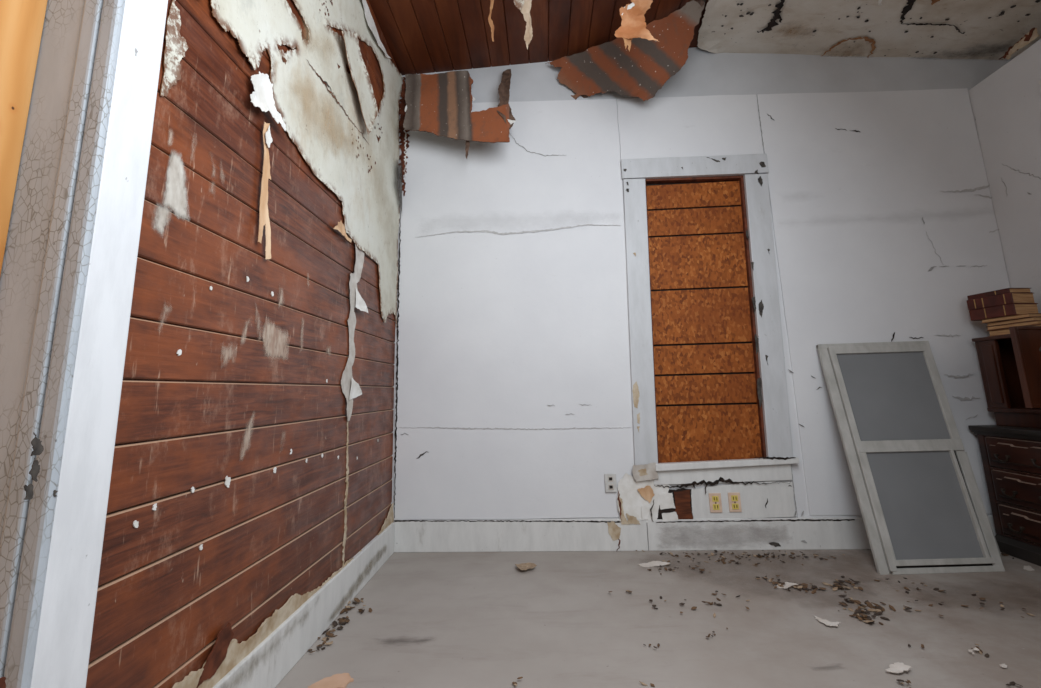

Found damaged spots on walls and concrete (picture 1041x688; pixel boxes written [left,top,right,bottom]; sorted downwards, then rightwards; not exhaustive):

peeling [160,0,188,97]
peeling [250,71,286,148]
peeling [337,31,380,143]
peeling [362,0,391,58]
peeling [154,152,187,233]
spalling [172,221,368,688]
spalling [617,463,693,526]